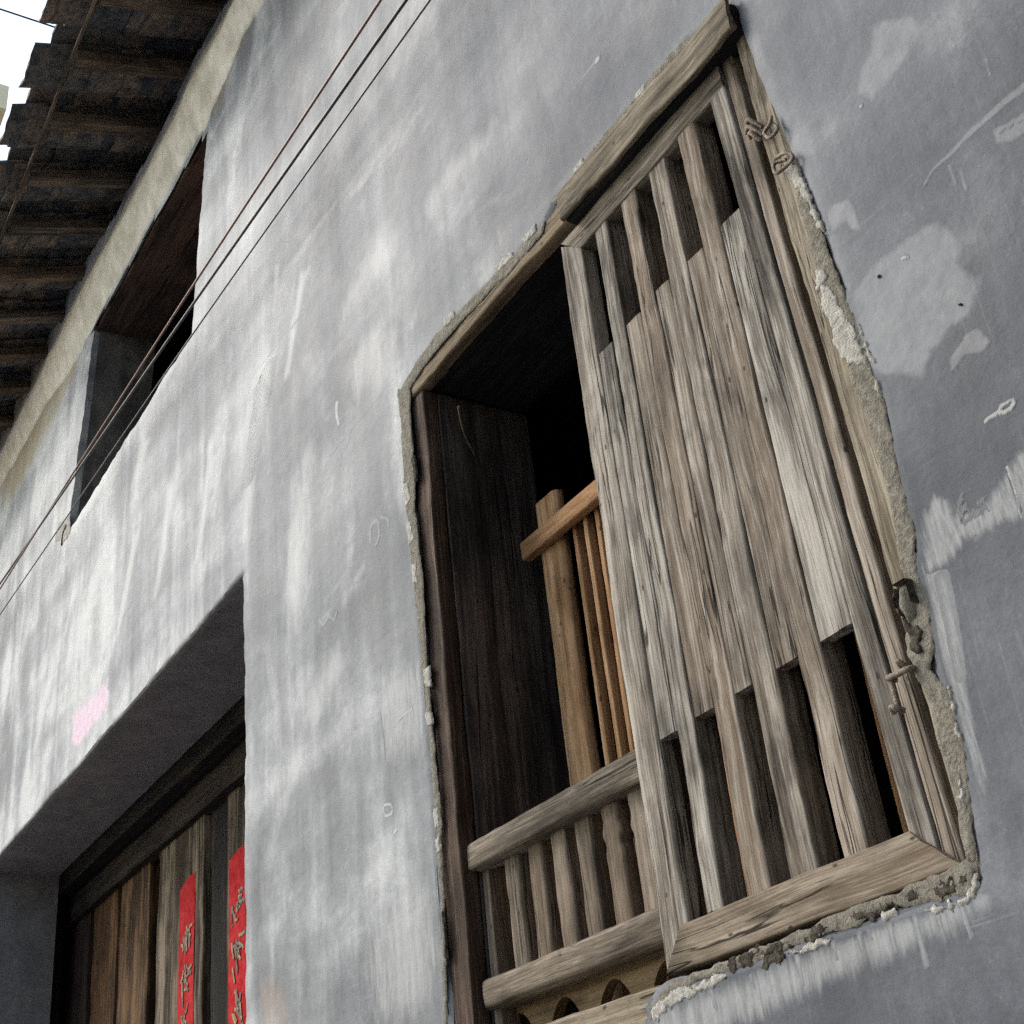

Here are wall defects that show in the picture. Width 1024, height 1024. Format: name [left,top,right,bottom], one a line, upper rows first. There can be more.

peeling [650,157,992,1022]